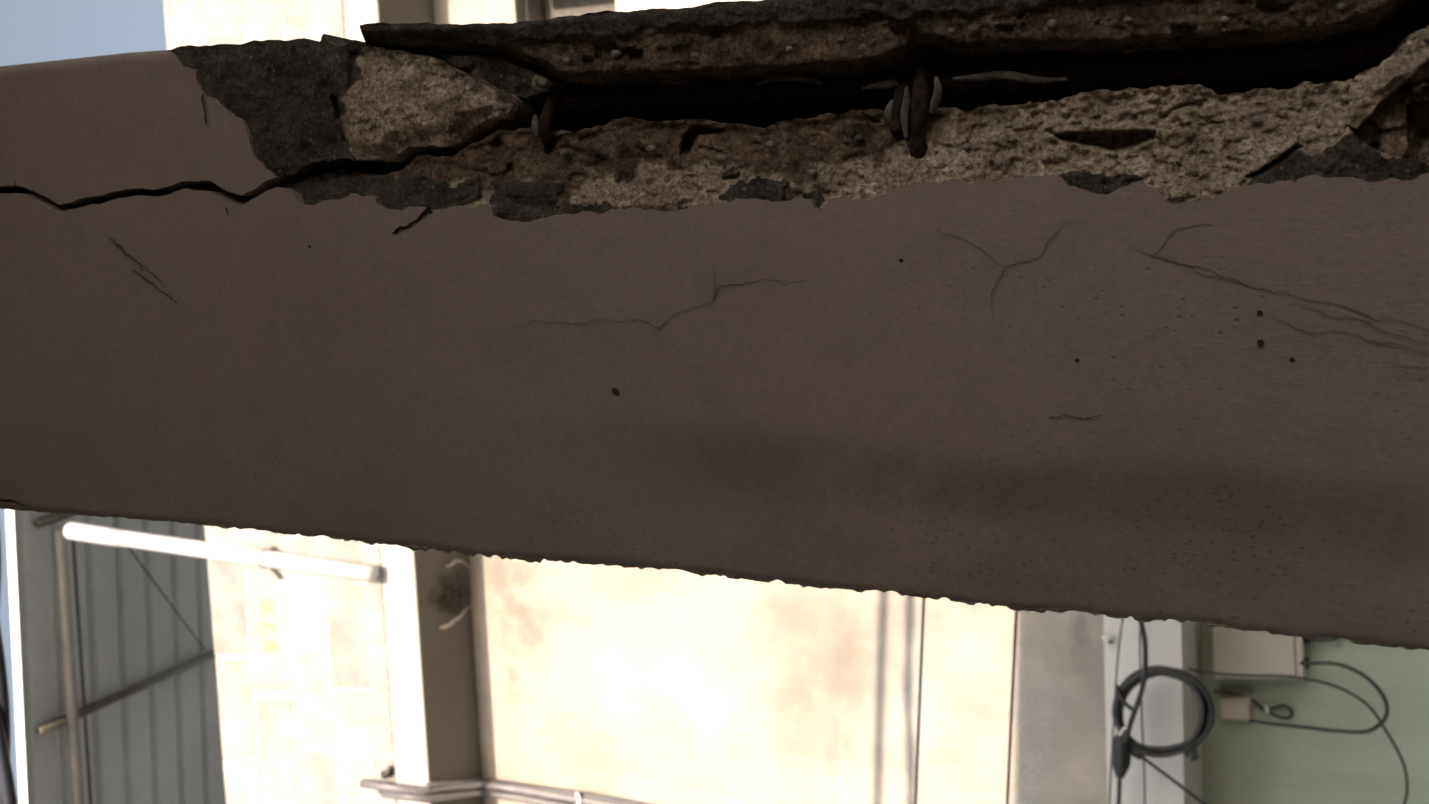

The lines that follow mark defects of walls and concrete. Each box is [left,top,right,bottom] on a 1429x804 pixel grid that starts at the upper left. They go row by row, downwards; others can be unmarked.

spalling [167,0,1429,222]
crack [0,181,279,215]
crack [0,498,25,506]
spalling [344,540,653,629]
spalling [687,571,867,593]
spalling [897,592,1416,650]